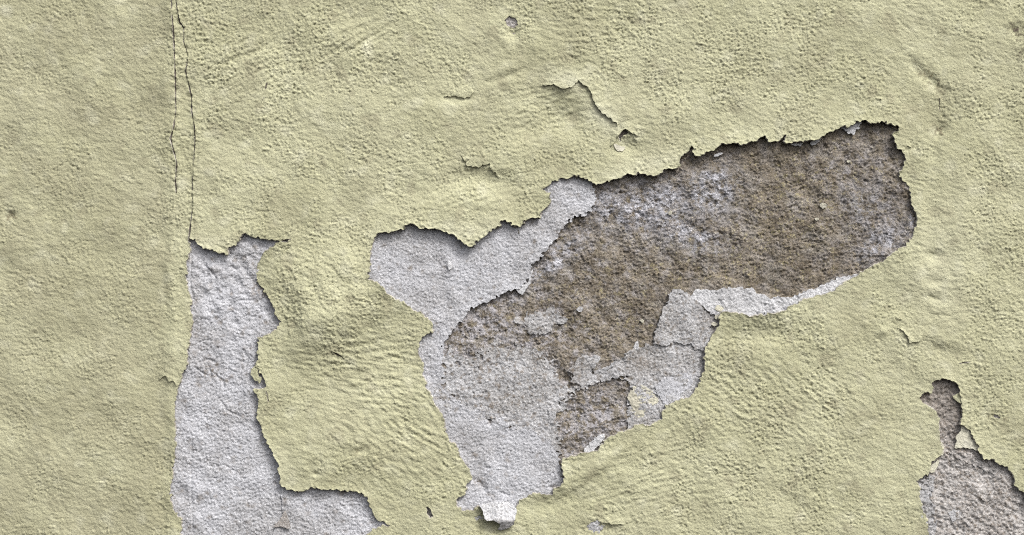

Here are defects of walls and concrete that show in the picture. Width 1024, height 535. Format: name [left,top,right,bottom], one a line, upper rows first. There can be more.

crack [170,7,196,241]
peeling [158,234,389,535]
peeling [587,514,626,534]
peeling [367,120,916,530]
peeling [916,379,1024,535]